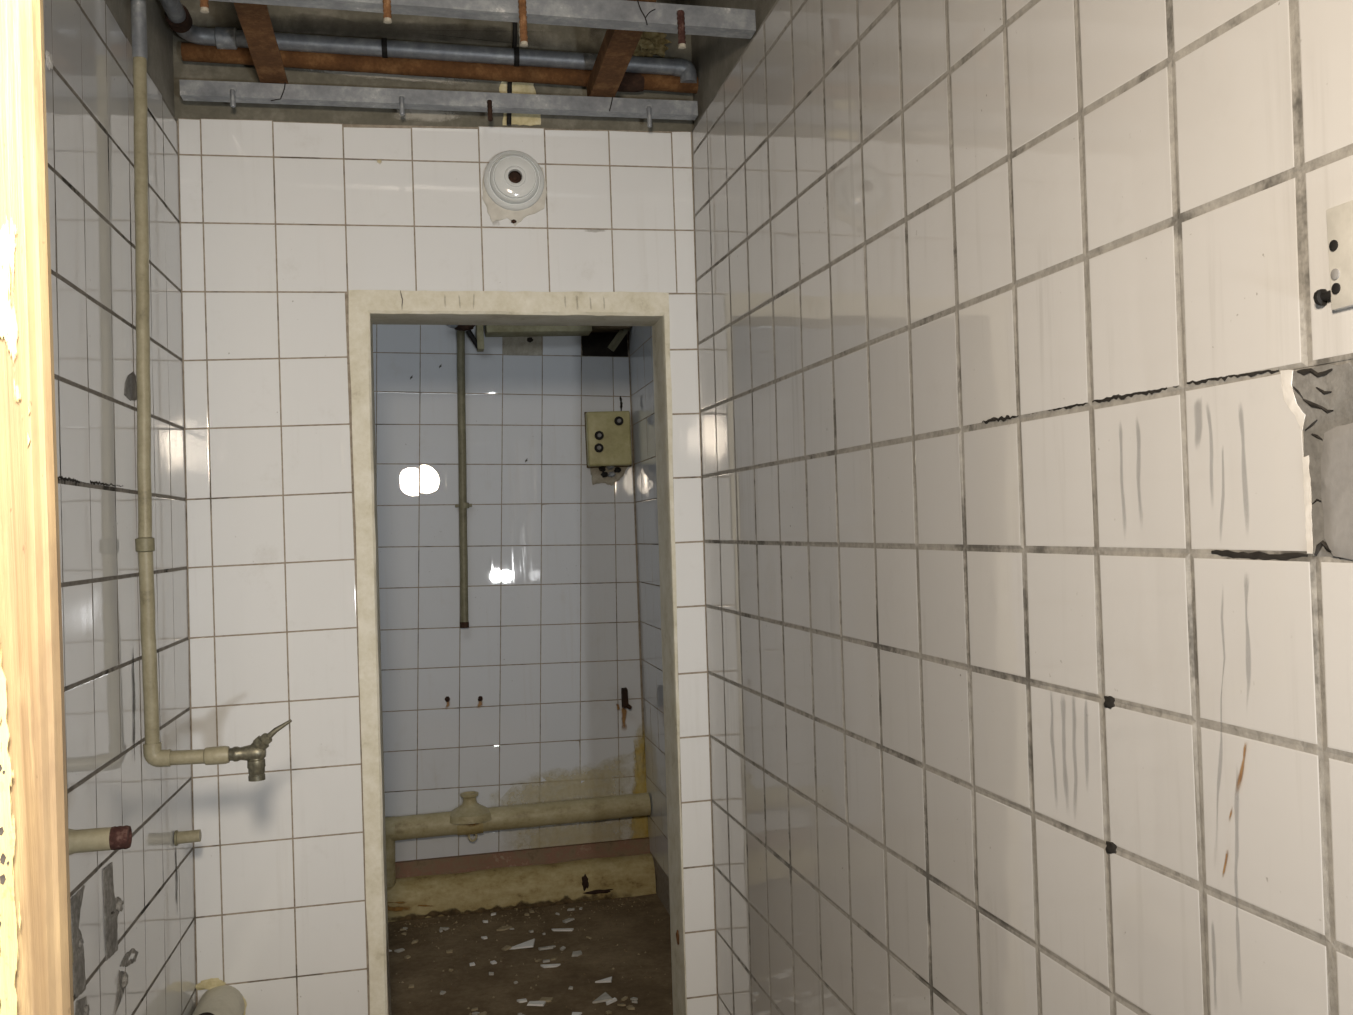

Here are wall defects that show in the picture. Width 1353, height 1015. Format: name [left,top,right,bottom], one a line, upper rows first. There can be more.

peeling [617,72,645,92]
peeling [0,215,18,363]
spalling [1280,363,1353,561]
peeling [0,646,21,1015]
damp [523,735,647,803]
damp [531,815,649,848]
spalling [70,885,90,1015]
spalling [103,862,139,1015]